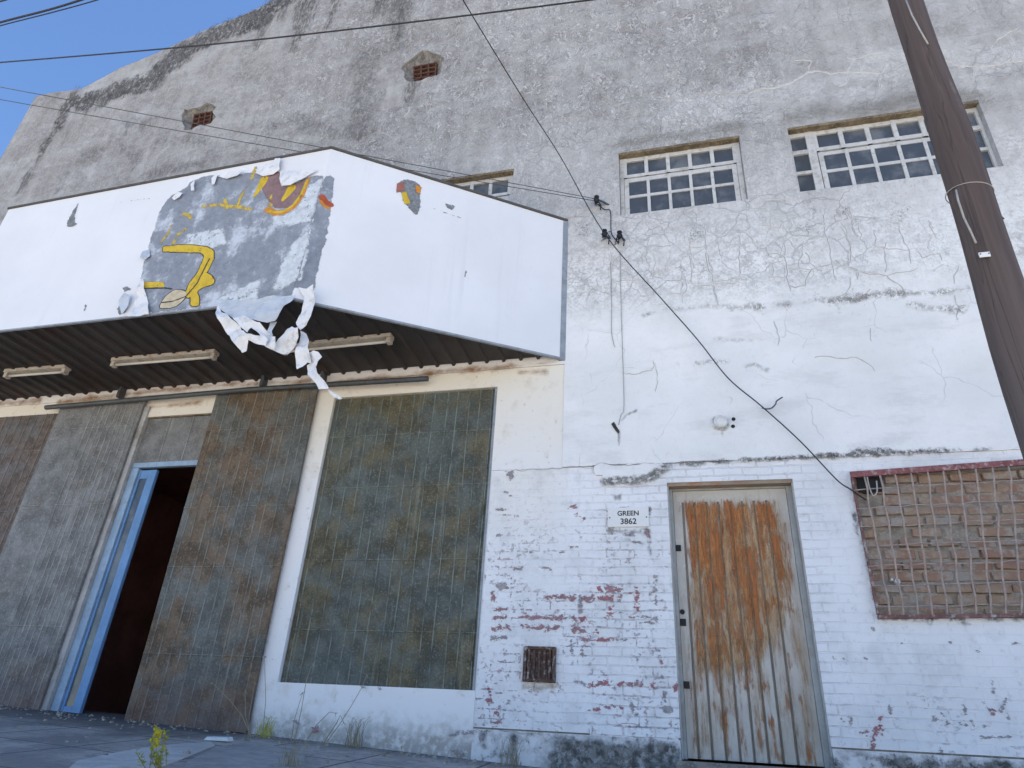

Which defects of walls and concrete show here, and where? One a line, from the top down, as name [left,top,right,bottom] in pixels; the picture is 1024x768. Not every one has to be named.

leakage [38,0,316,160]
crack [570,205,965,318]
crack [815,328,875,371]
crack [624,361,658,391]
leakage [743,448,946,461]
peeling [490,575,678,717]
peeling [840,705,892,750]
peeling [933,681,1012,741]
leakage [548,737,679,768]